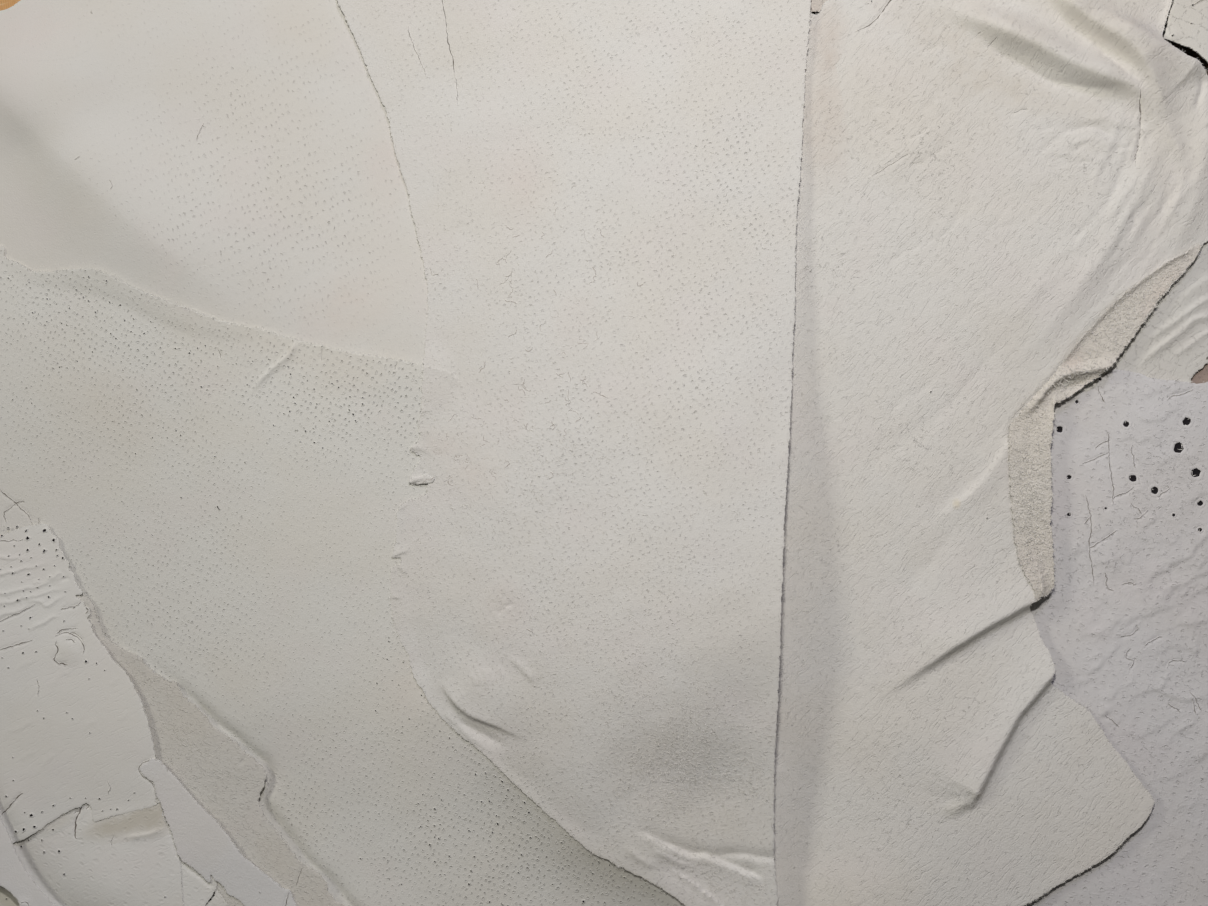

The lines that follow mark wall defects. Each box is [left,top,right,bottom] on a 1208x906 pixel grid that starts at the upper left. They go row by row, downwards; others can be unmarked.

crack [408,0,458,99]
peeling [68,796,171,845]